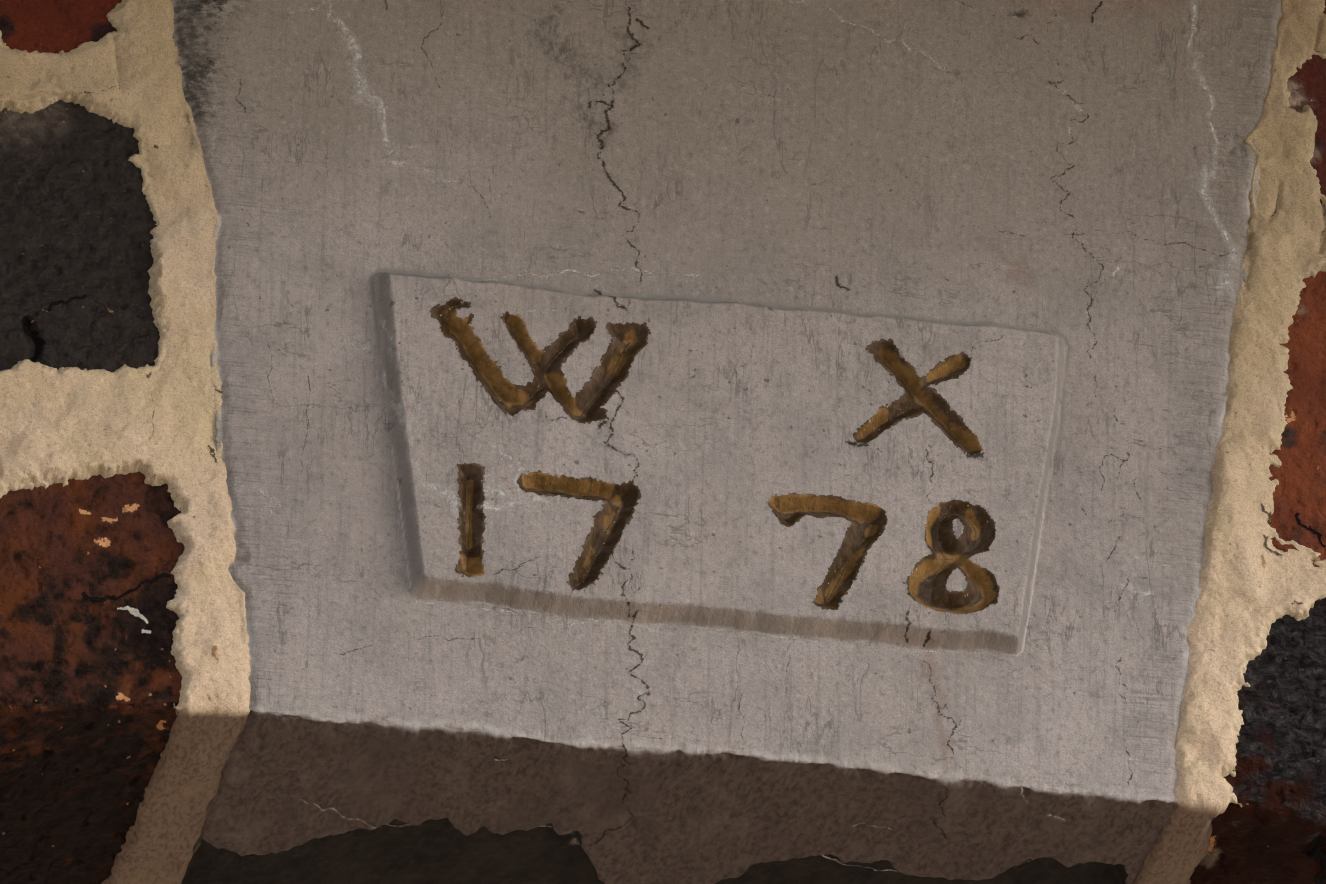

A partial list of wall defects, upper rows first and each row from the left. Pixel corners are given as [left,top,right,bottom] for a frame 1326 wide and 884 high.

crack [588,0,650,310]
crack [1001,0,1238,422]
crack [598,390,639,482]
crack [1081,452,1187,604]
crack [590,549,650,850]